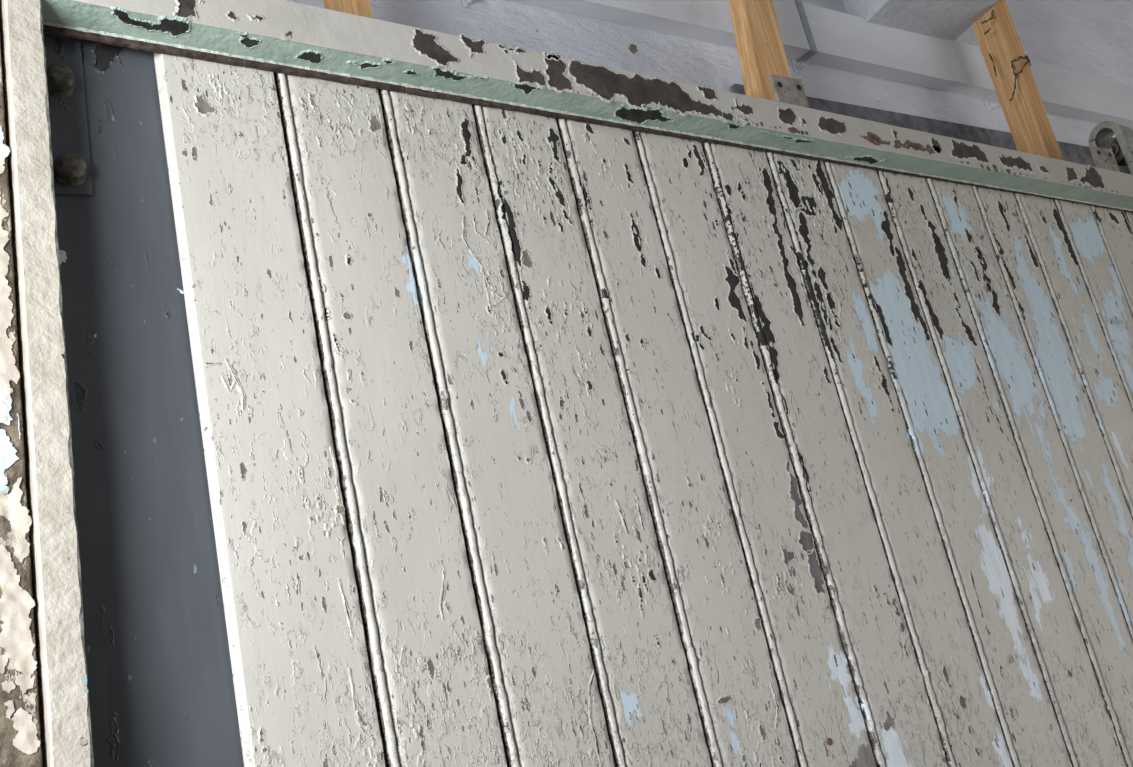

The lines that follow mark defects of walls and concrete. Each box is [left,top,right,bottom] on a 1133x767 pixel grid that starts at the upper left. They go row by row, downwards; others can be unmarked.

peeling [110,6,192,38]
peeling [193,73,235,117]
peeling [237,31,262,49]
peeling [294,50,325,65]
peeling [346,58,489,82]
peeling [613,104,675,124]
peeling [454,116,646,398]
peeling [625,208,662,280]
peeling [681,142,1133,653]
peeling [0,192,40,755]
peeling [872,445,1059,767]
peeling [825,644,912,767]